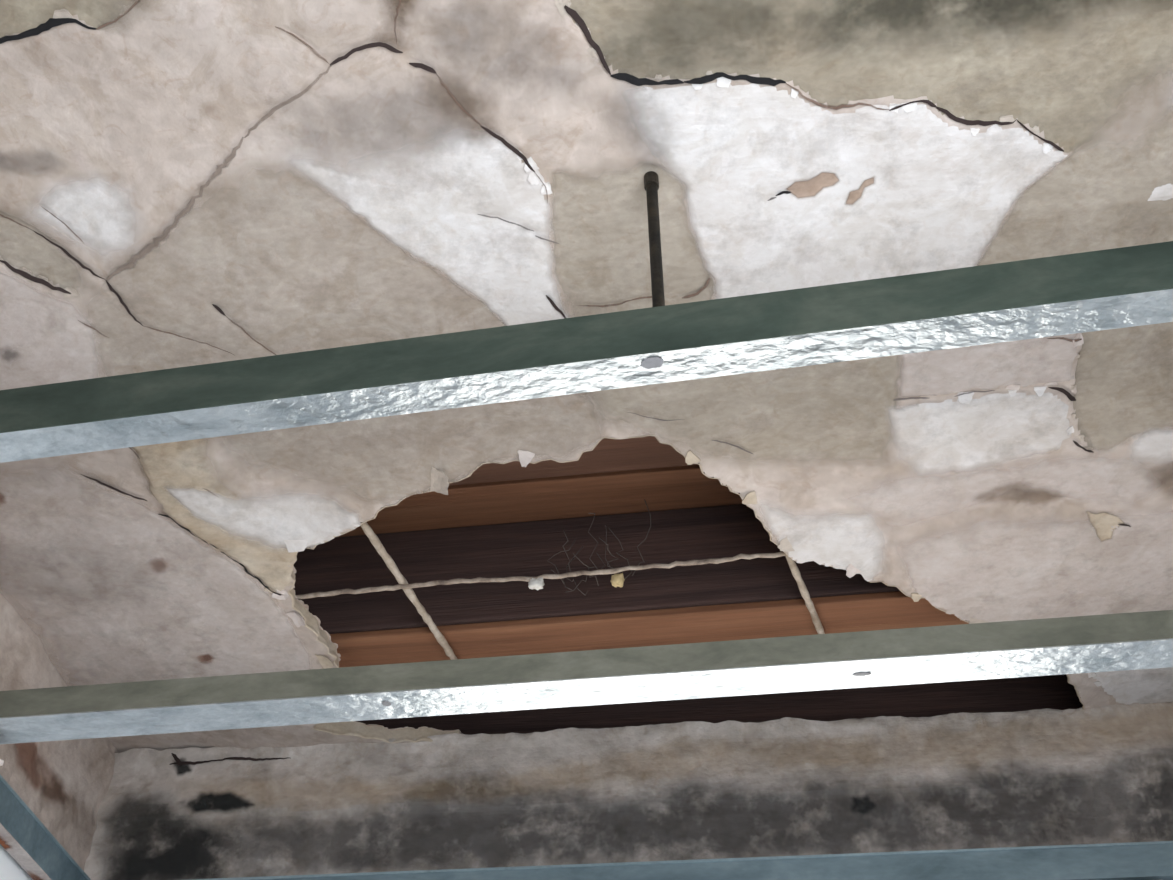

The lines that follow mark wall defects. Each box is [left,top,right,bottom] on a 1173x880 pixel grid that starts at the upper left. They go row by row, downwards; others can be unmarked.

water stain [832,0,931,29]
crack [564,5,1064,152]
crack [0,0,559,355]
peeling [0,0,1173,390]
crack [546,295,652,318]
peeling [223,322,1173,582]
peeling [0,471,360,686]
crack [81,474,281,596]
peeling [903,512,1173,624]
water stain [175,760,191,774]
water stain [108,783,926,880]
water stain [926,771,1173,849]